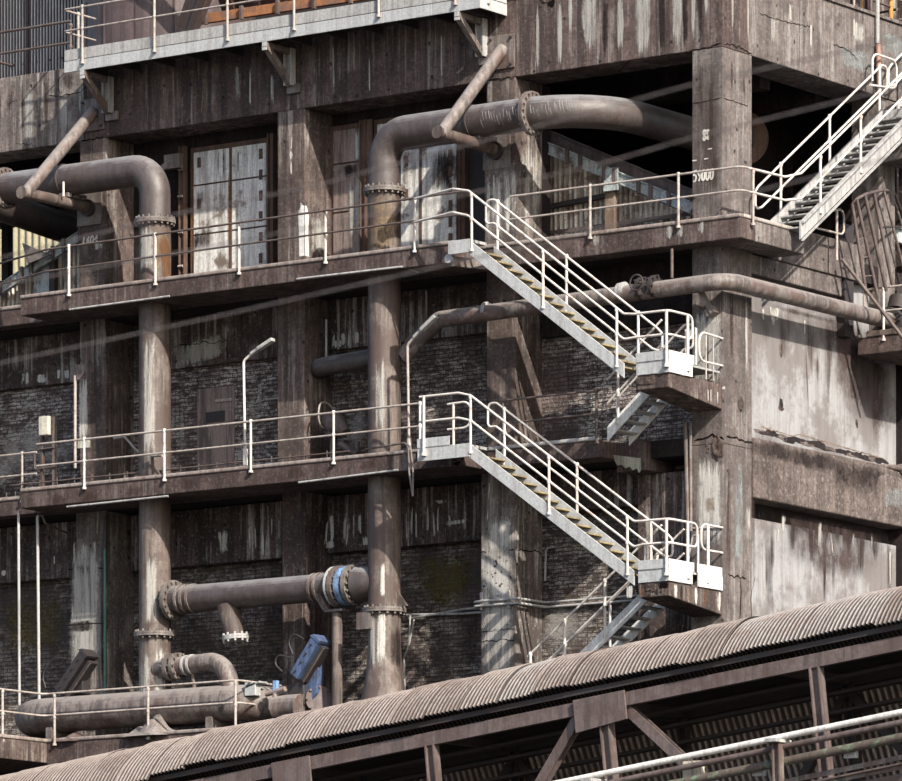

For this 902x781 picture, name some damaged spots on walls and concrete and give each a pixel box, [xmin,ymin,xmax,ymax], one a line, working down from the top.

water stain [557,0,624,63]
water stain [636,0,708,53]
peeling [298,203,324,256]
spalling [753,426,889,464]
water stain [727,467,877,603]